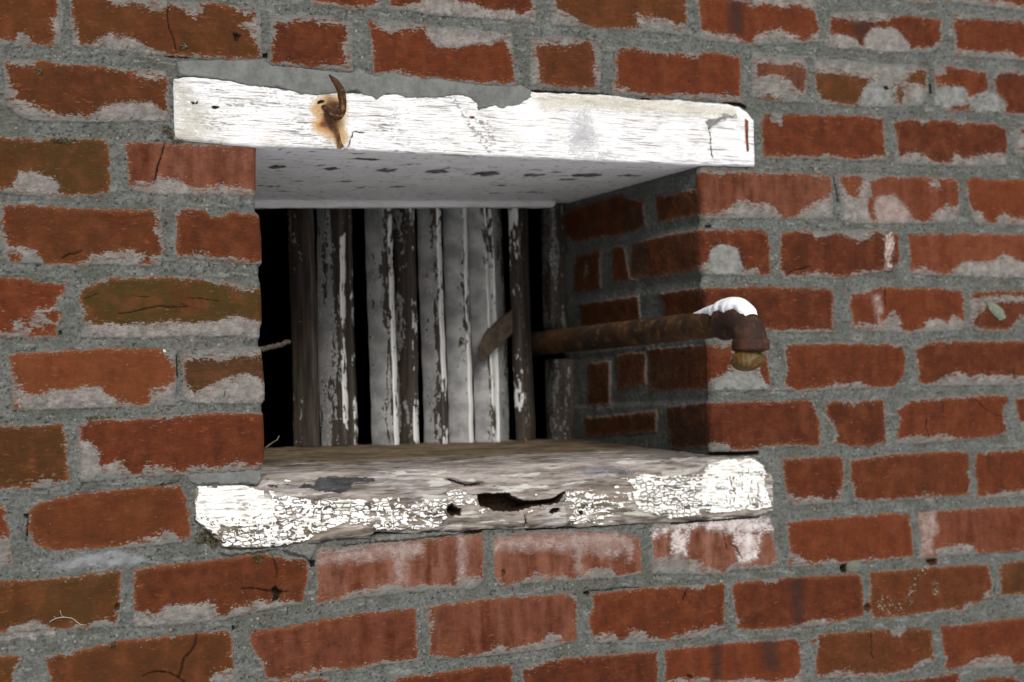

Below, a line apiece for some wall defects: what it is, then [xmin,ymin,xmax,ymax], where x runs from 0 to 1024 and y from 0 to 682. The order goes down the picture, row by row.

damp [827,27,911,54]
rust [310,95,348,144]
crack [154,143,165,183]
efflorescence [841,196,907,224]
peeling [195,484,487,547]
peeling [565,458,773,525]
crack [242,556,287,592]
crack [143,633,197,682]